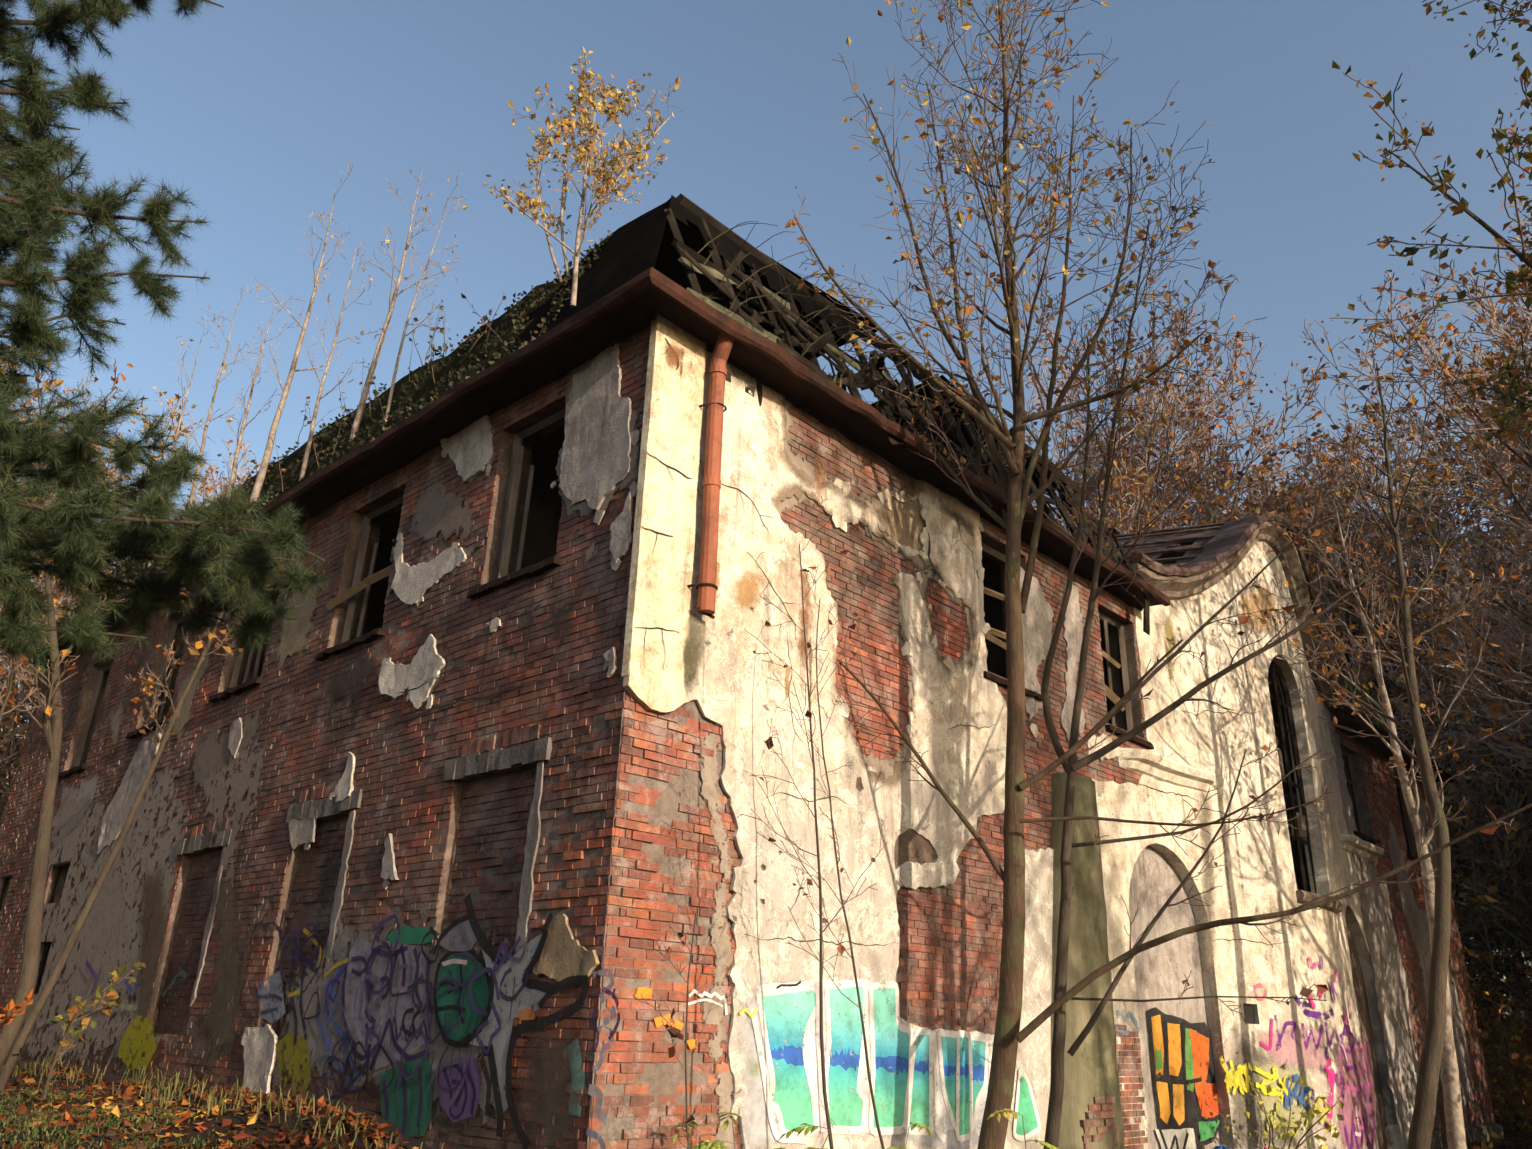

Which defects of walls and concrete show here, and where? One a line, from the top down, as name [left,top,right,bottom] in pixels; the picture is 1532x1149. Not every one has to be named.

flaking render [375,634,446,710]
flaking render [383,415,496,617]
flaking render [486,617,501,633]
flaking render [550,340,640,579]
flaking render [725,373,1259,1034]
flaking render [240,833,510,1130]
flaking render [529,647,848,1149]
flaking render [1080,1024,1148,1149]